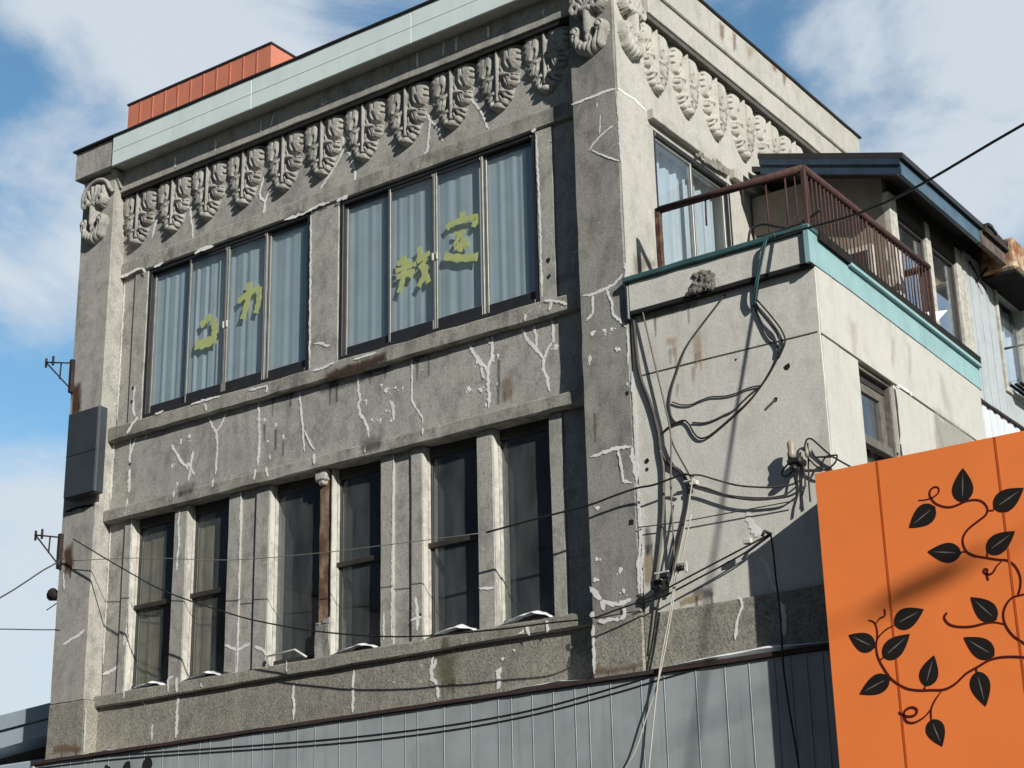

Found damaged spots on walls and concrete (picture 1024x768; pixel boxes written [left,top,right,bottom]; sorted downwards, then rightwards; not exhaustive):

crack [571,88,647,161]
rust [72,384,81,412]
crack [248,384,269,479]
crack [299,392,316,464]
rust [327,353,386,378]
crack [313,342,424,452]
crack [468,335,494,408]
rust [64,546,73,577]
crack [590,445,645,674]
crack [429,657,440,698]